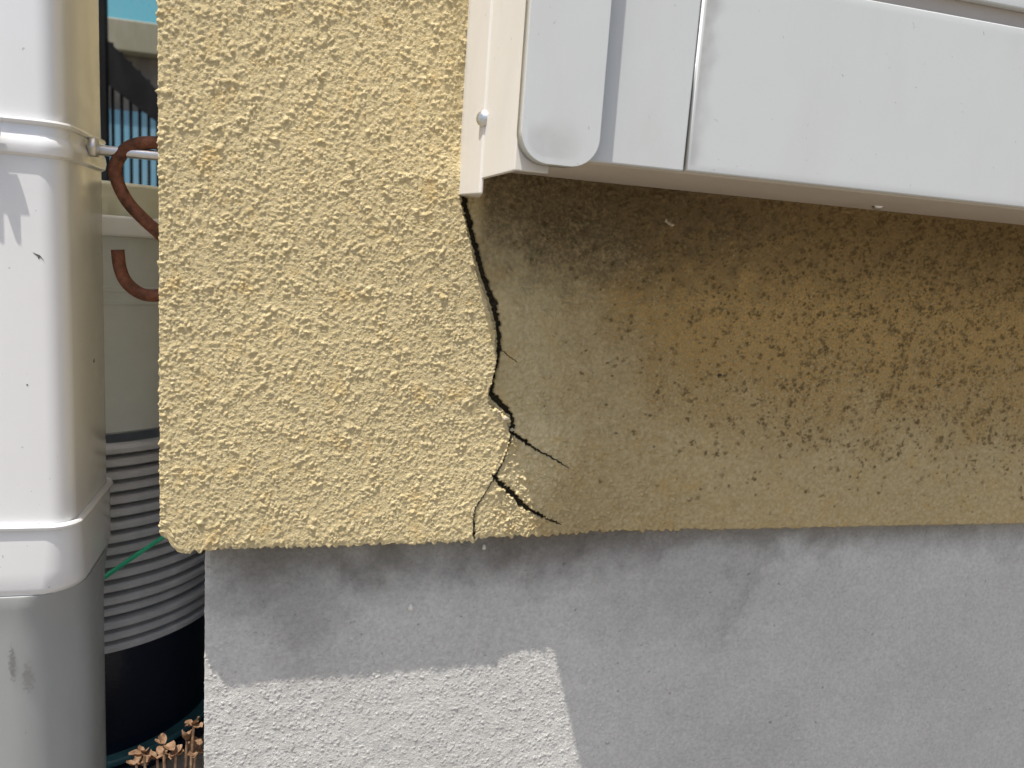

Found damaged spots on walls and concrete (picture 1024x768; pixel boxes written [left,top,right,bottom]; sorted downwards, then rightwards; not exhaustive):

crack [461,196,569,539]
damp [544,182,1024,478]